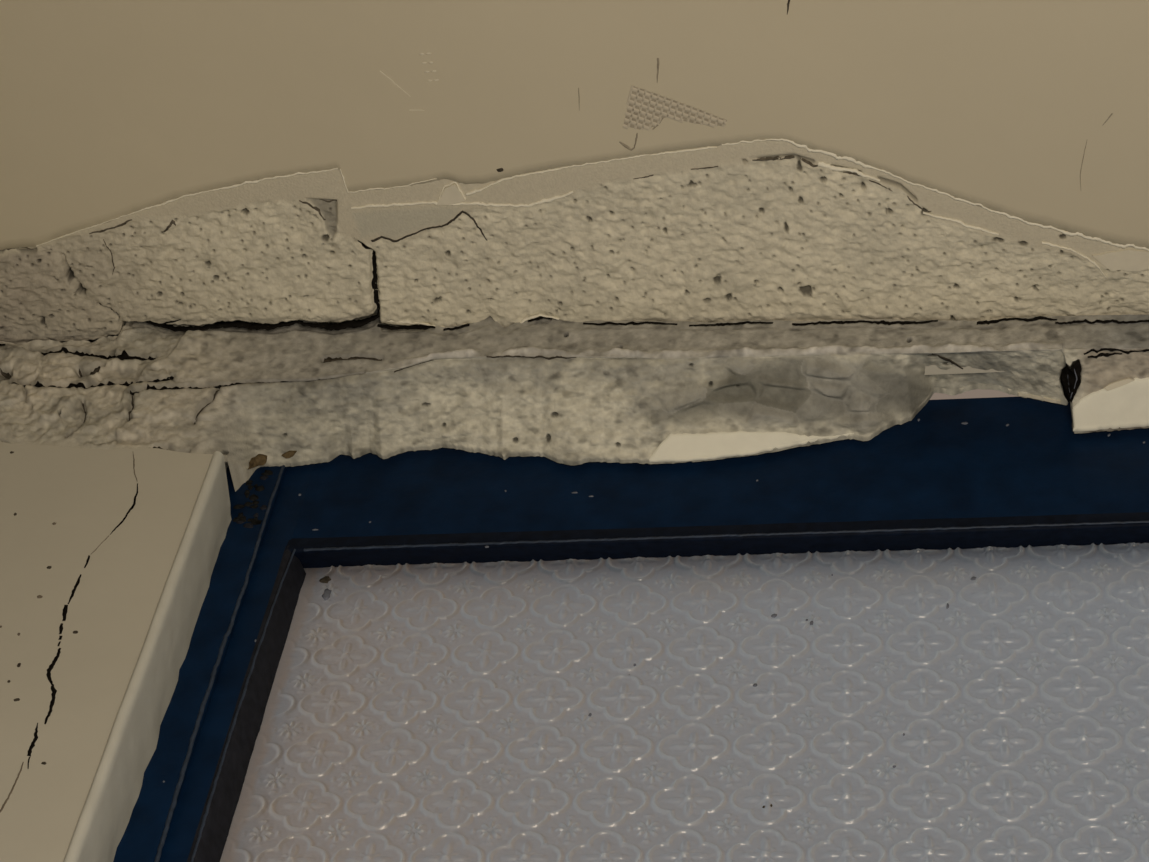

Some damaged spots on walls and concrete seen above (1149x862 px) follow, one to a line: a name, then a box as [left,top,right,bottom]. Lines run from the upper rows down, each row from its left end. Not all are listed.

crack [0,210,487,424]
crack [487,353,576,361]
spalling [0,133,1149,528]
crack [583,319,938,327]
crack [933,354,963,369]
crack [0,447,162,813]